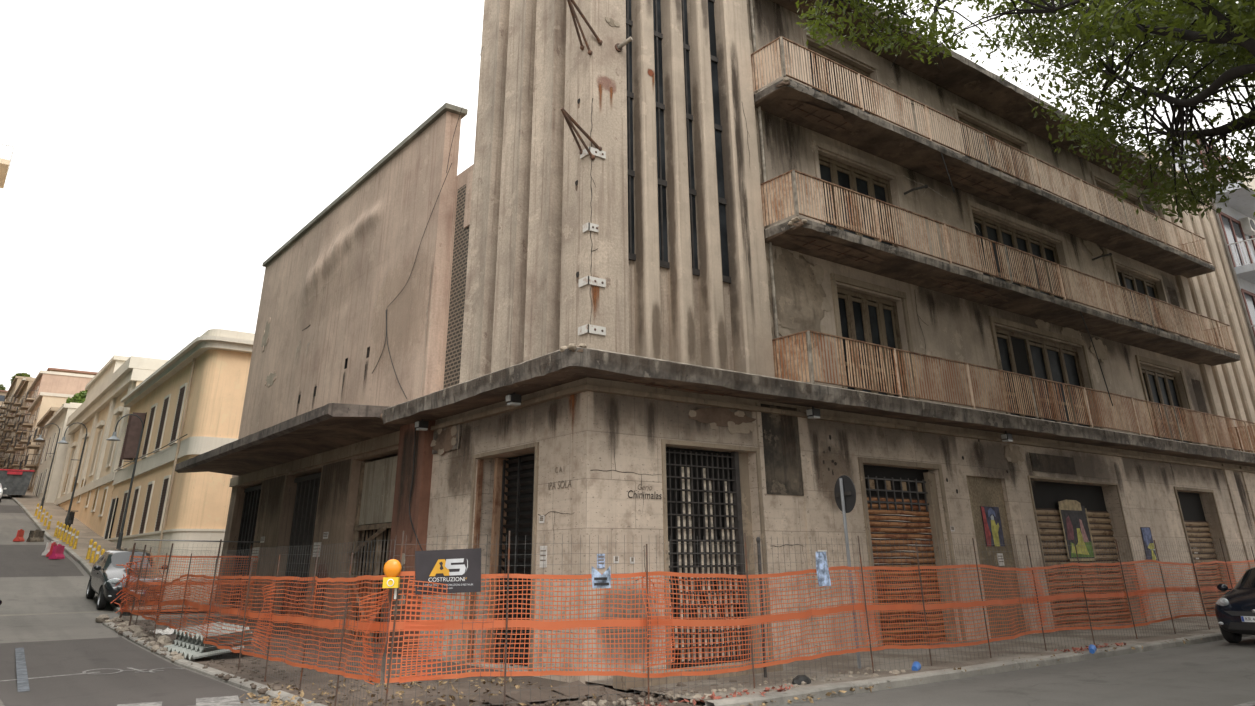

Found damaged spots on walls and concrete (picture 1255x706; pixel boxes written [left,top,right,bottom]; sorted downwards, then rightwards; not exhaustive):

damp [732,60,743,168]